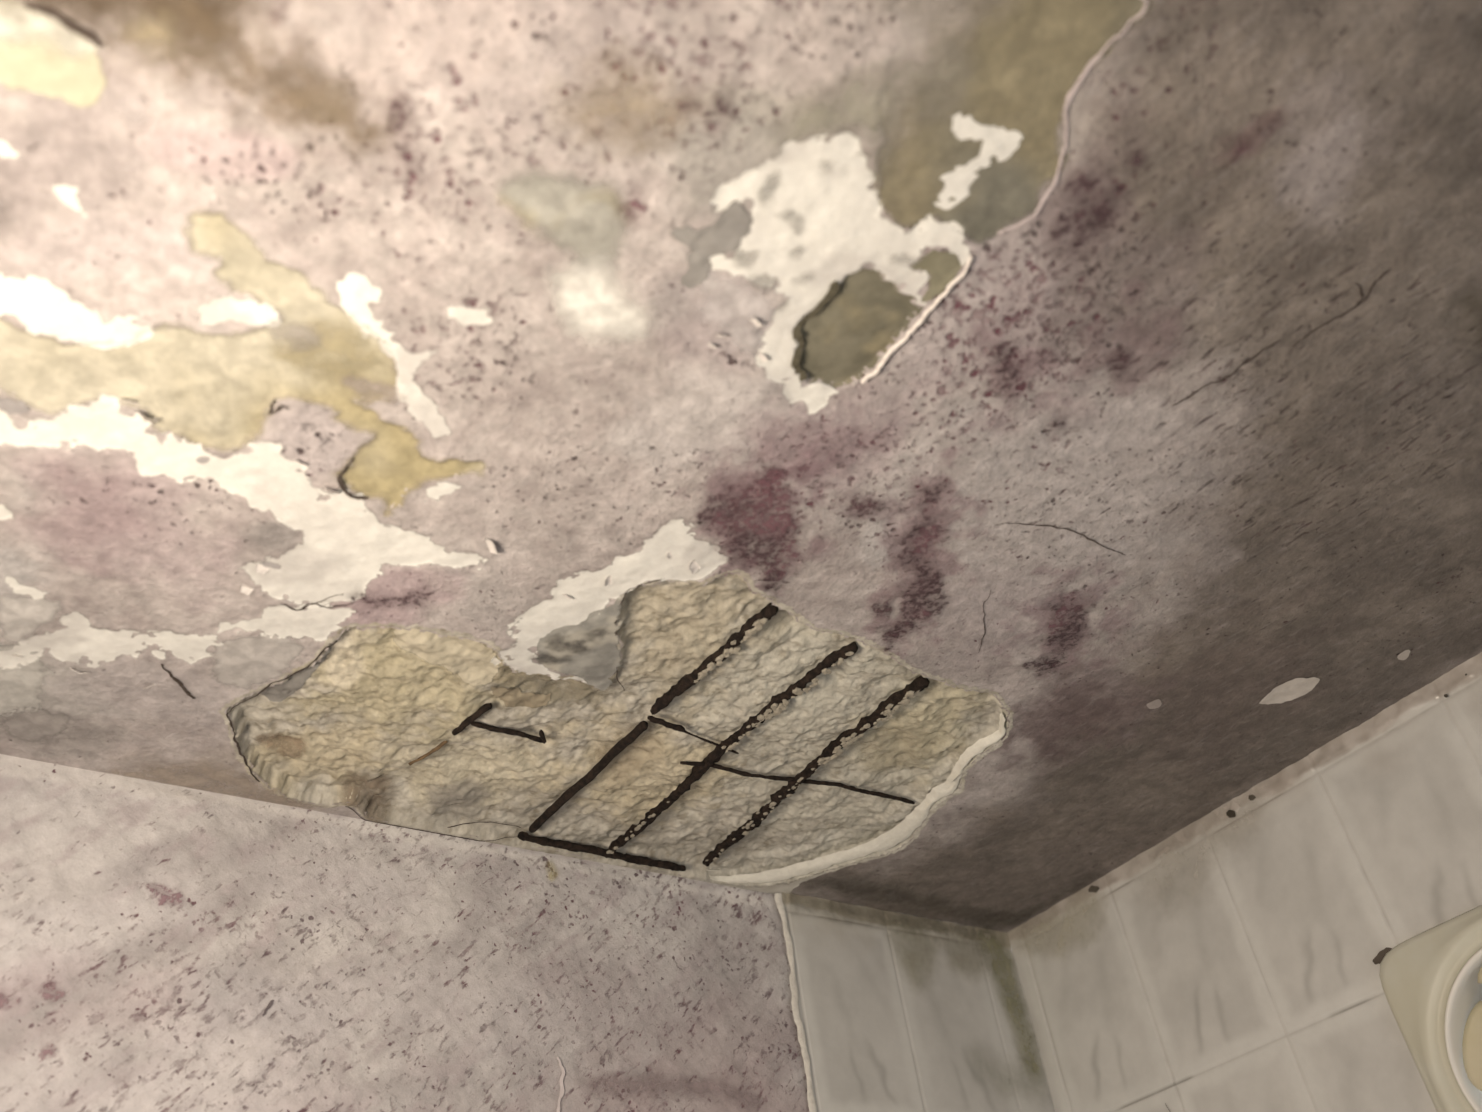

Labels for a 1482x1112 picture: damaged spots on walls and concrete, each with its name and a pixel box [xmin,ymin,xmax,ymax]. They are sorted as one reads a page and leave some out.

peeling [0,0,106,107]
peeling [671,0,1151,415]
crack [1173,268,1390,406]
spalling [0,213,1014,895]
damp [842,497,883,517]
damp [872,600,900,651]
damp [1022,657,1063,676]
peeling [1259,677,1320,704]
damp [979,936,1039,1073]